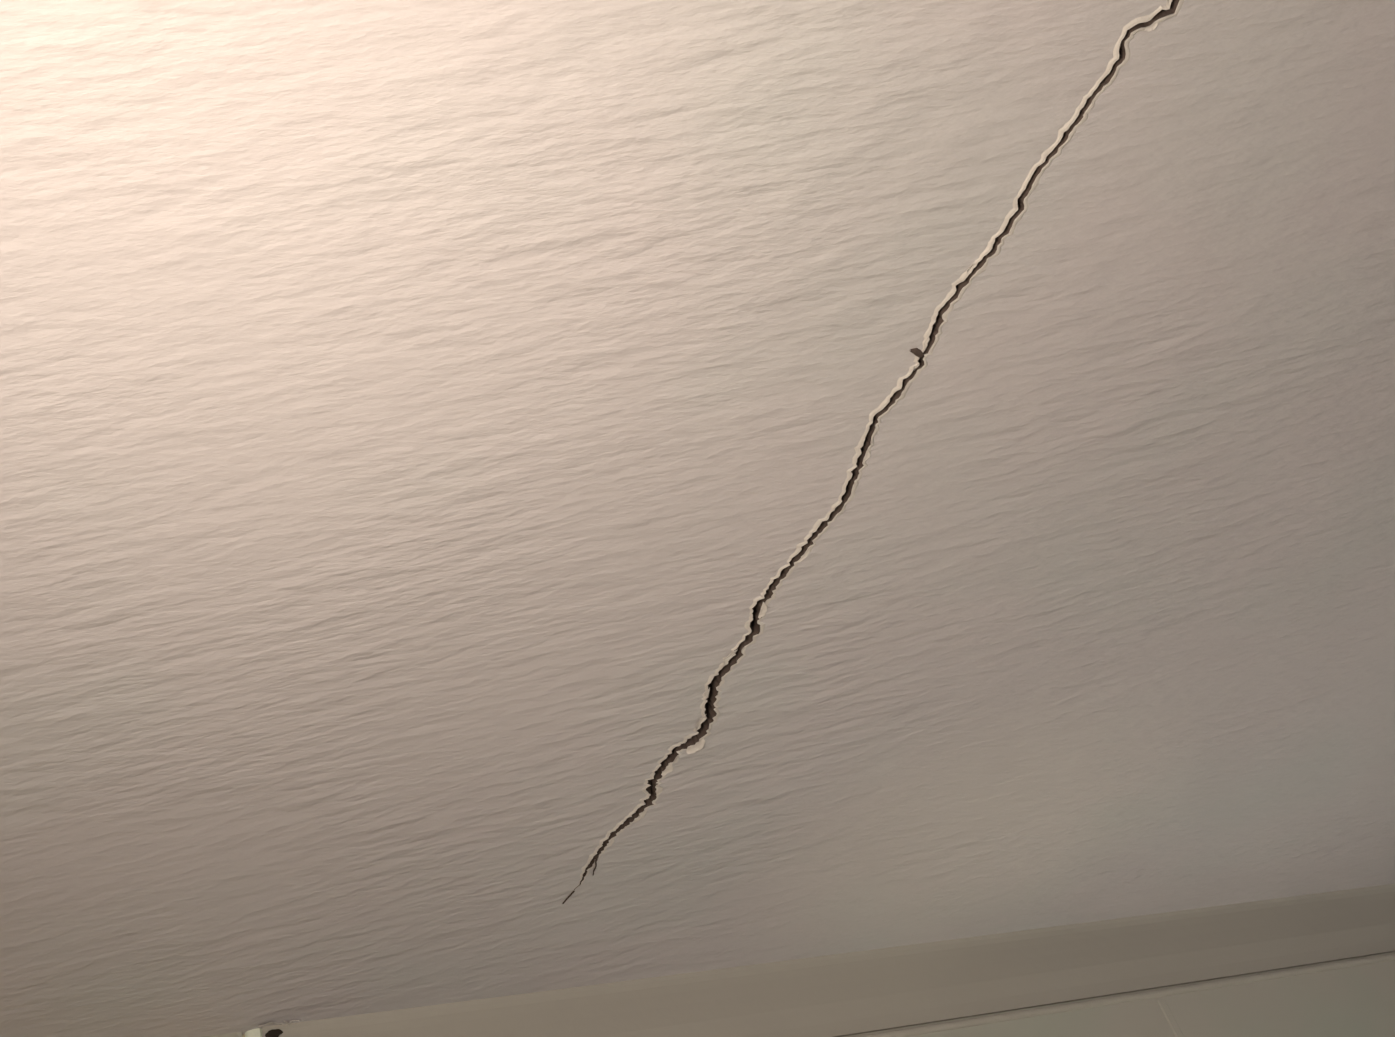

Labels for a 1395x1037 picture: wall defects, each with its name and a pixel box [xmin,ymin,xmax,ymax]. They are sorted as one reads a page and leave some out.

crack [563,0,1184,904]